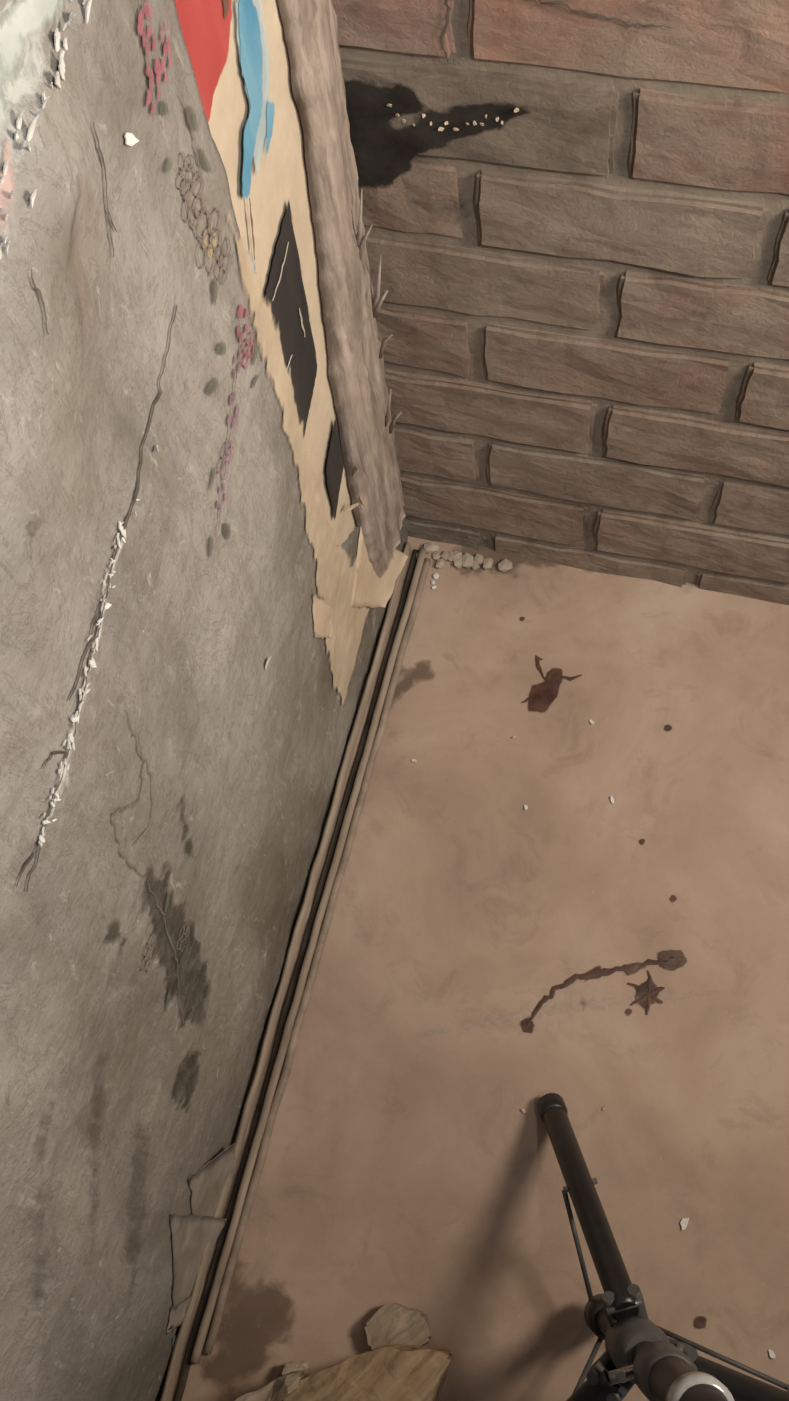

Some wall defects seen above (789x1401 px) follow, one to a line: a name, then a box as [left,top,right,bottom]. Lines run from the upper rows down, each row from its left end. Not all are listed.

crack [538,0,673,29]
peeling [0,0,92,260]
peeling [387,104,519,131]
crack [31,269,49,335]
crack [16,305,177,892]
water stain [521,655,582,712]
water stain [112,710,209,1026]
water stain [106,921,127,950]
water stain [521,950,687,1033]
water stain [173,1052,200,1111]